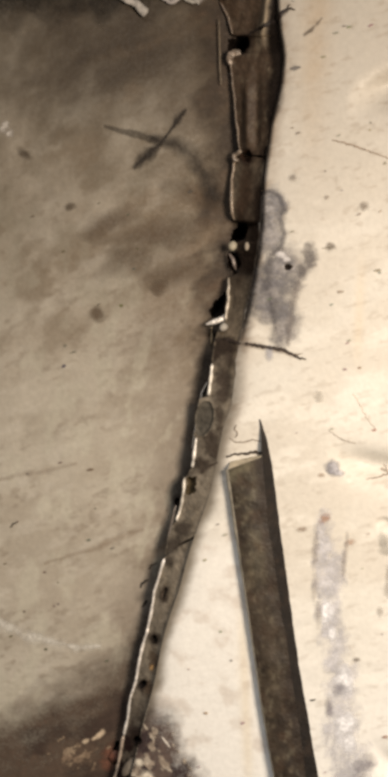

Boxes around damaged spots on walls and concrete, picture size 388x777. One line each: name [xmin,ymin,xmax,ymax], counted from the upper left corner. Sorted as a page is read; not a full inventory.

crack [226,337,306,360]
peeling [57,730,104,771]
peeling [131,725,172,777]